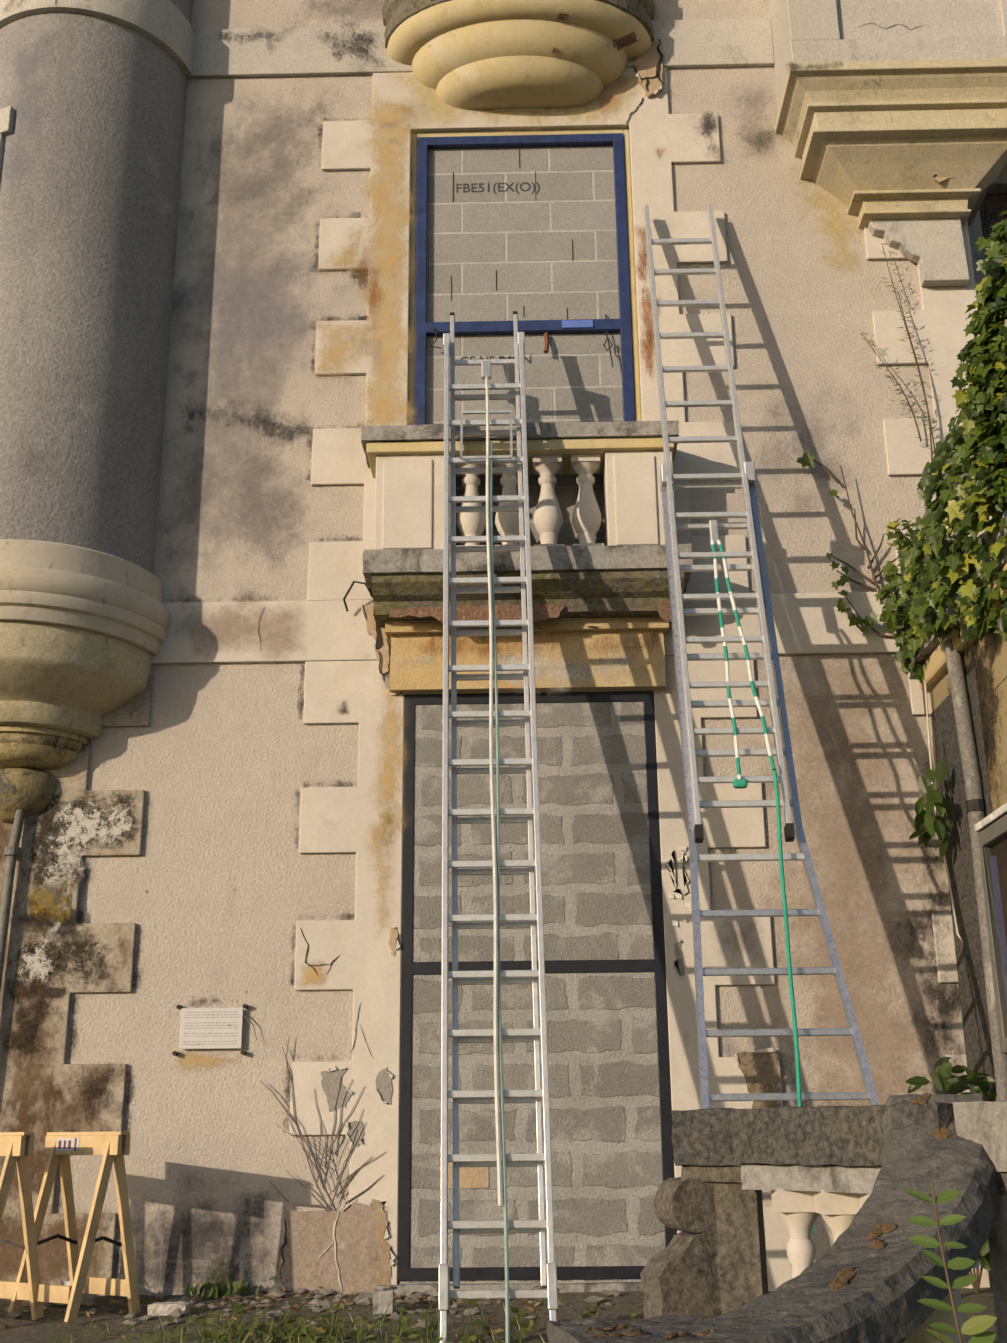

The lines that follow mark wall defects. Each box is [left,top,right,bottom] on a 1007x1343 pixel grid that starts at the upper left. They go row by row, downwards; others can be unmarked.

crack [626,39,664,128]
leakage [187,409,305,439]
crack [301,930,339,974]
leakage [7,904,110,1195]
leakage [0,1219,98,1284]